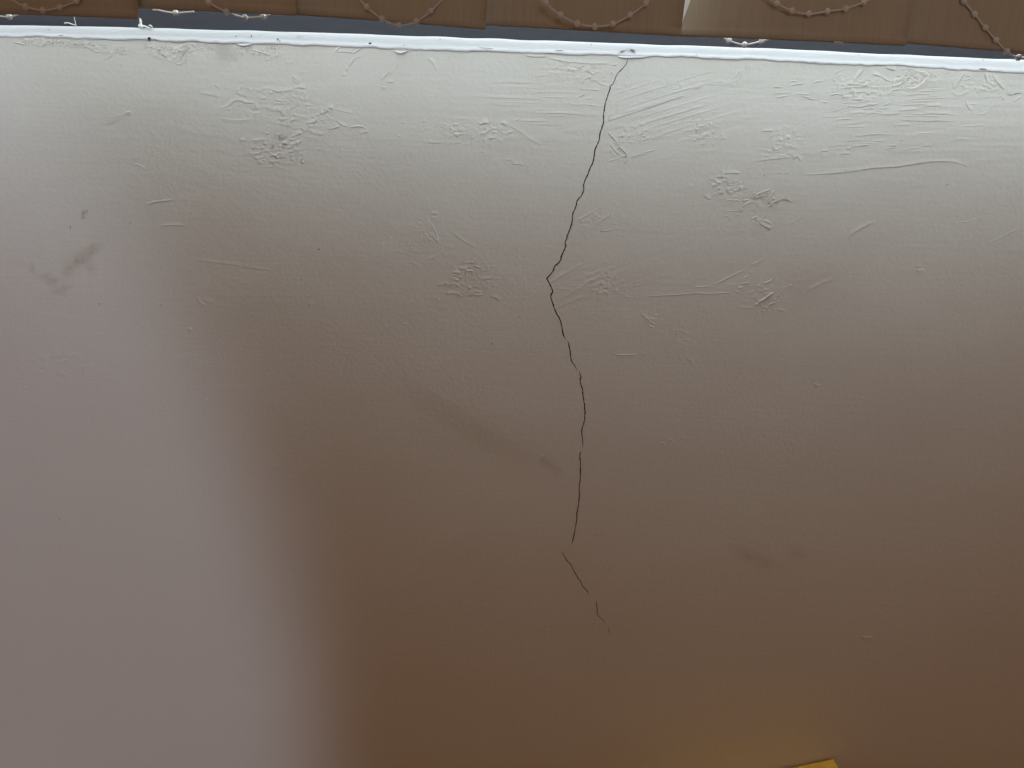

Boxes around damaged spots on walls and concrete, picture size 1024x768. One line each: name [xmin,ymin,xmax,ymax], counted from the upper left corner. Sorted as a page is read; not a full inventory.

crack [546,59,685,635]